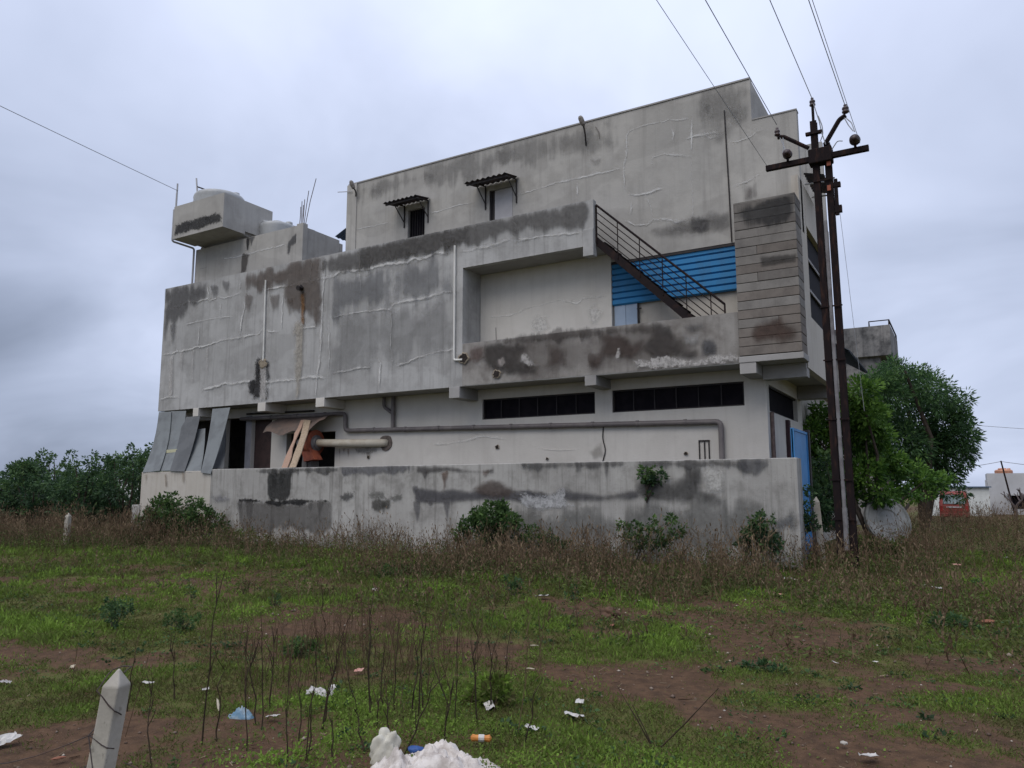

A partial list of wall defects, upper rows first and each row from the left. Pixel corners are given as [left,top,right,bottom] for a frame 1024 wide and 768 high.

crack [522,119,751,226]
leakage [174,213,222,236]
leakage [741,197,790,225]
leakage [164,285,205,335]
crack [168,232,578,394]
leakage [241,202,587,399]
leakage [471,324,716,372]
leakage [239,466,460,506]
leakage [371,492,401,511]
leakage [415,470,604,502]
leakage [522,462,623,470]
leakage [617,459,767,501]